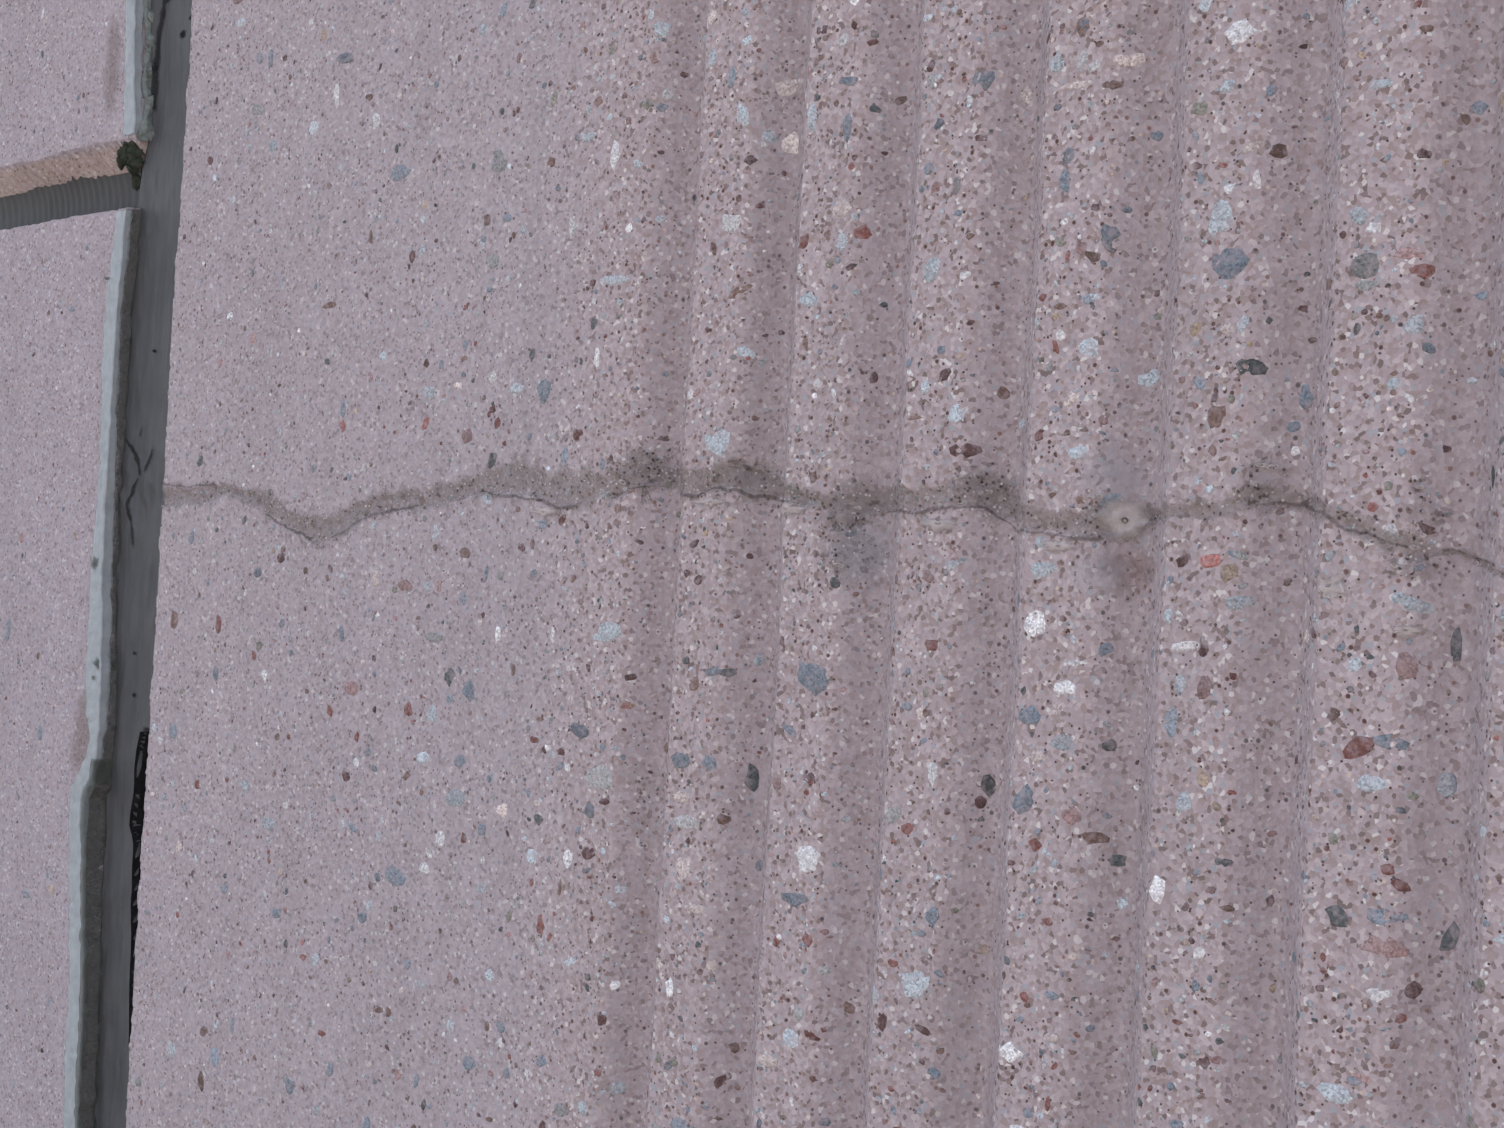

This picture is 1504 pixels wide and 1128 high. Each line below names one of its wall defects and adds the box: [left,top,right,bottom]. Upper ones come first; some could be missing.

crack [164,450,1503,575]
crack [1318,575,1344,596]